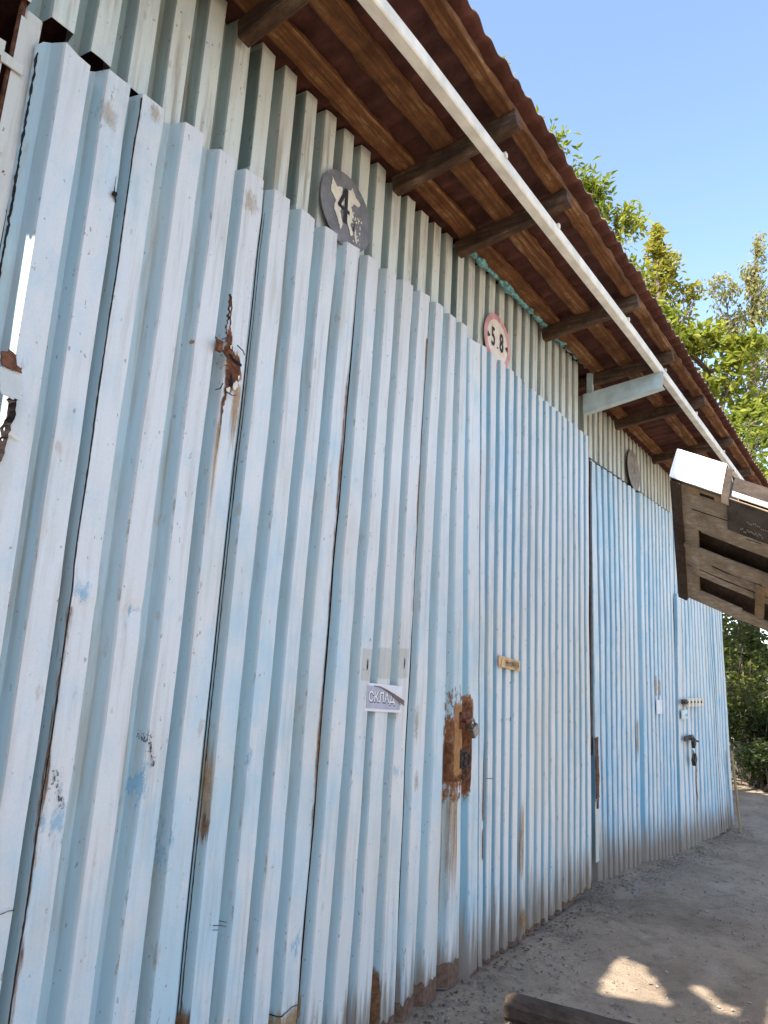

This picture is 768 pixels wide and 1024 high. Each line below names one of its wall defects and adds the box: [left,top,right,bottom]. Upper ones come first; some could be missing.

corrosion [0,349,22,373]
corrosion [212,329,242,485]
corrosion [201,750,212,843]
corrosion [439,688,484,892]
corrosion [175,1007,190,1024]
corrosion [369,883,592,1024]